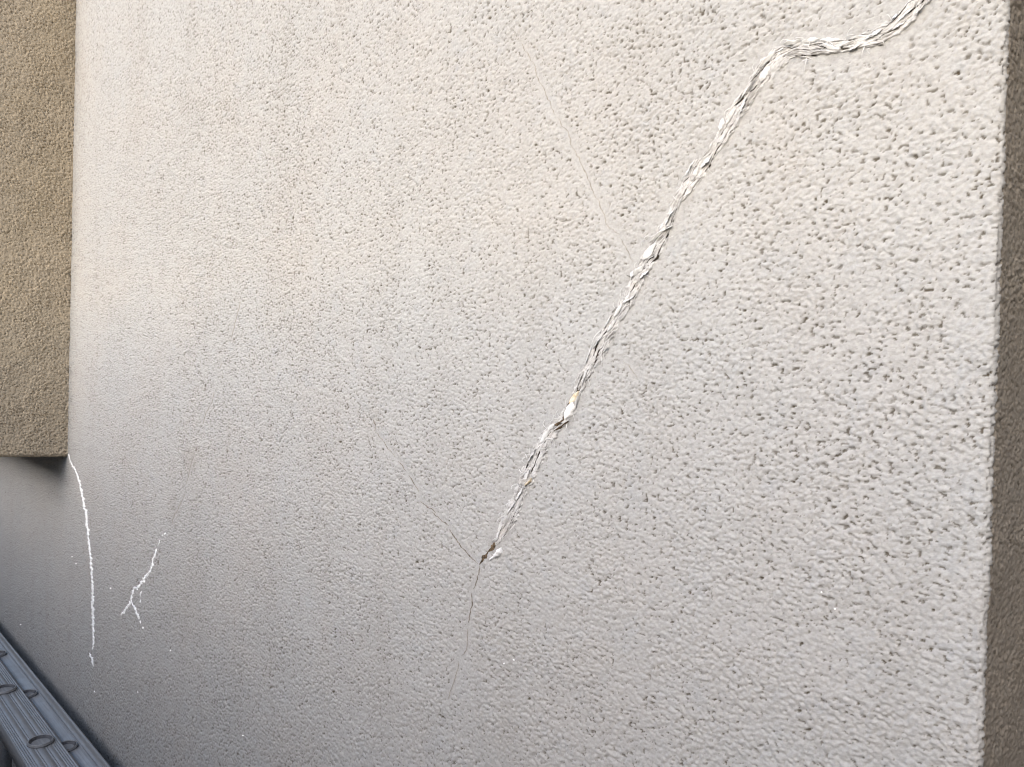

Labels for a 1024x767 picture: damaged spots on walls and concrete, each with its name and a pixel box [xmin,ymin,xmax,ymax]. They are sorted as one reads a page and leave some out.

crack [373,0,932,699]
crack [68,454,95,666]
crack [121,453,195,629]